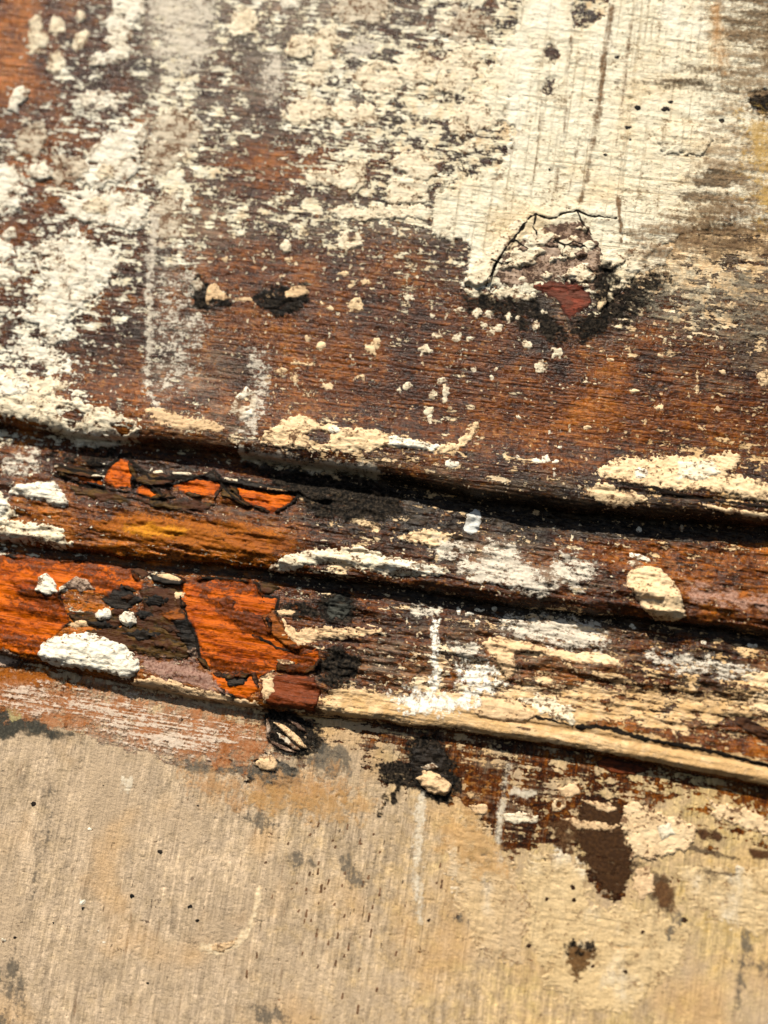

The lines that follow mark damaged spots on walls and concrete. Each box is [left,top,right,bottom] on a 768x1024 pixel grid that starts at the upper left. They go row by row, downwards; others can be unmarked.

crack [485,209,618,287]
peeling [461,219,673,311]
spalling [184,273,310,318]
peeling [387,435,440,453]
crack [53,452,319,512]
peeling [54,429,331,514]
crack [620,481,768,508]
peeling [387,557,444,575]
peeling [0,553,382,791]
crack [535,715,768,768]
peeling [556,782,620,832]
peeling [706,797,768,836]